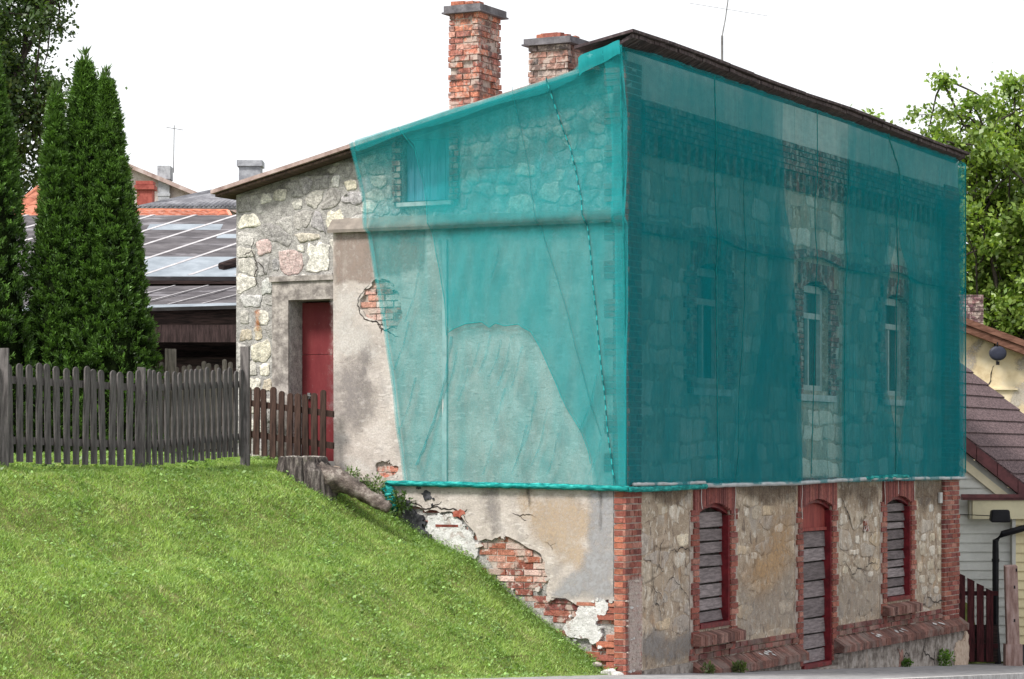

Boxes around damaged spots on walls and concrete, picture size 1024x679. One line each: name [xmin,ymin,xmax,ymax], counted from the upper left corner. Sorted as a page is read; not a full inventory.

spalling [335,279,402,355]
spalling [341,457,399,478]
spalling [416,486,614,649]
crack [651,542,690,628]